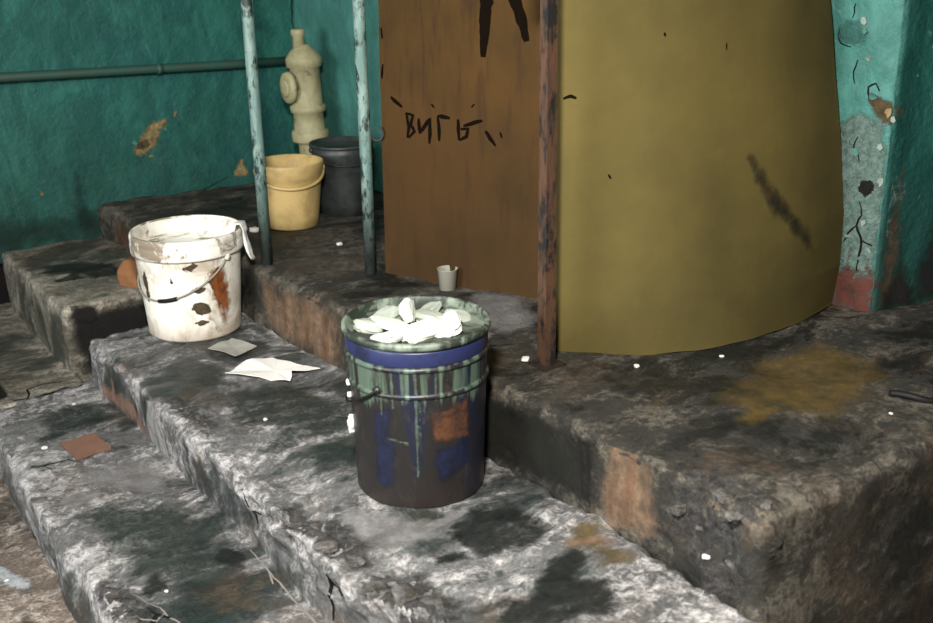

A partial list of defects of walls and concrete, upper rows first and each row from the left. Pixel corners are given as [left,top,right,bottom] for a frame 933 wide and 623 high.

peeling [132,111,177,157]
flaking render [840,83,904,278]